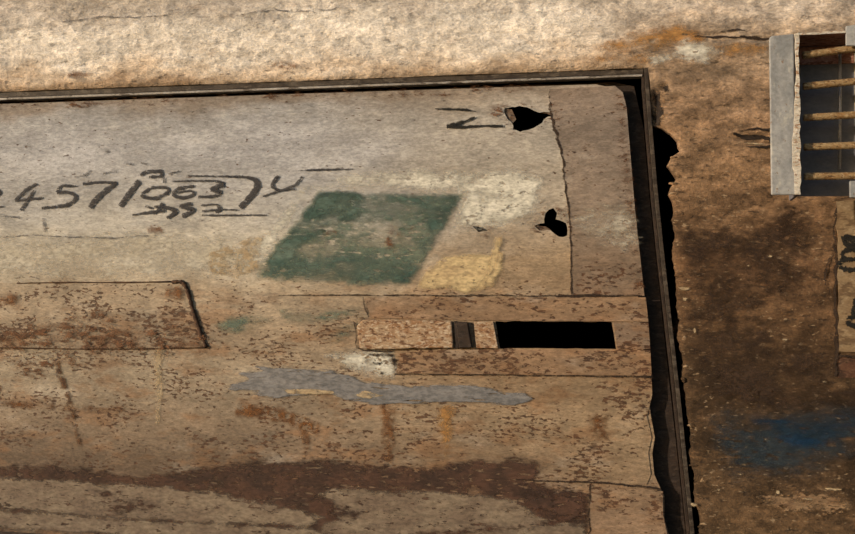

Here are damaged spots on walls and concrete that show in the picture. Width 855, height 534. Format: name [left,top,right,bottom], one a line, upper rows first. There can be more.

spalling [0,79,707,534]
corrosion [0,309,206,419]
corrosion [235,403,317,449]
peeling [761,488,849,515]